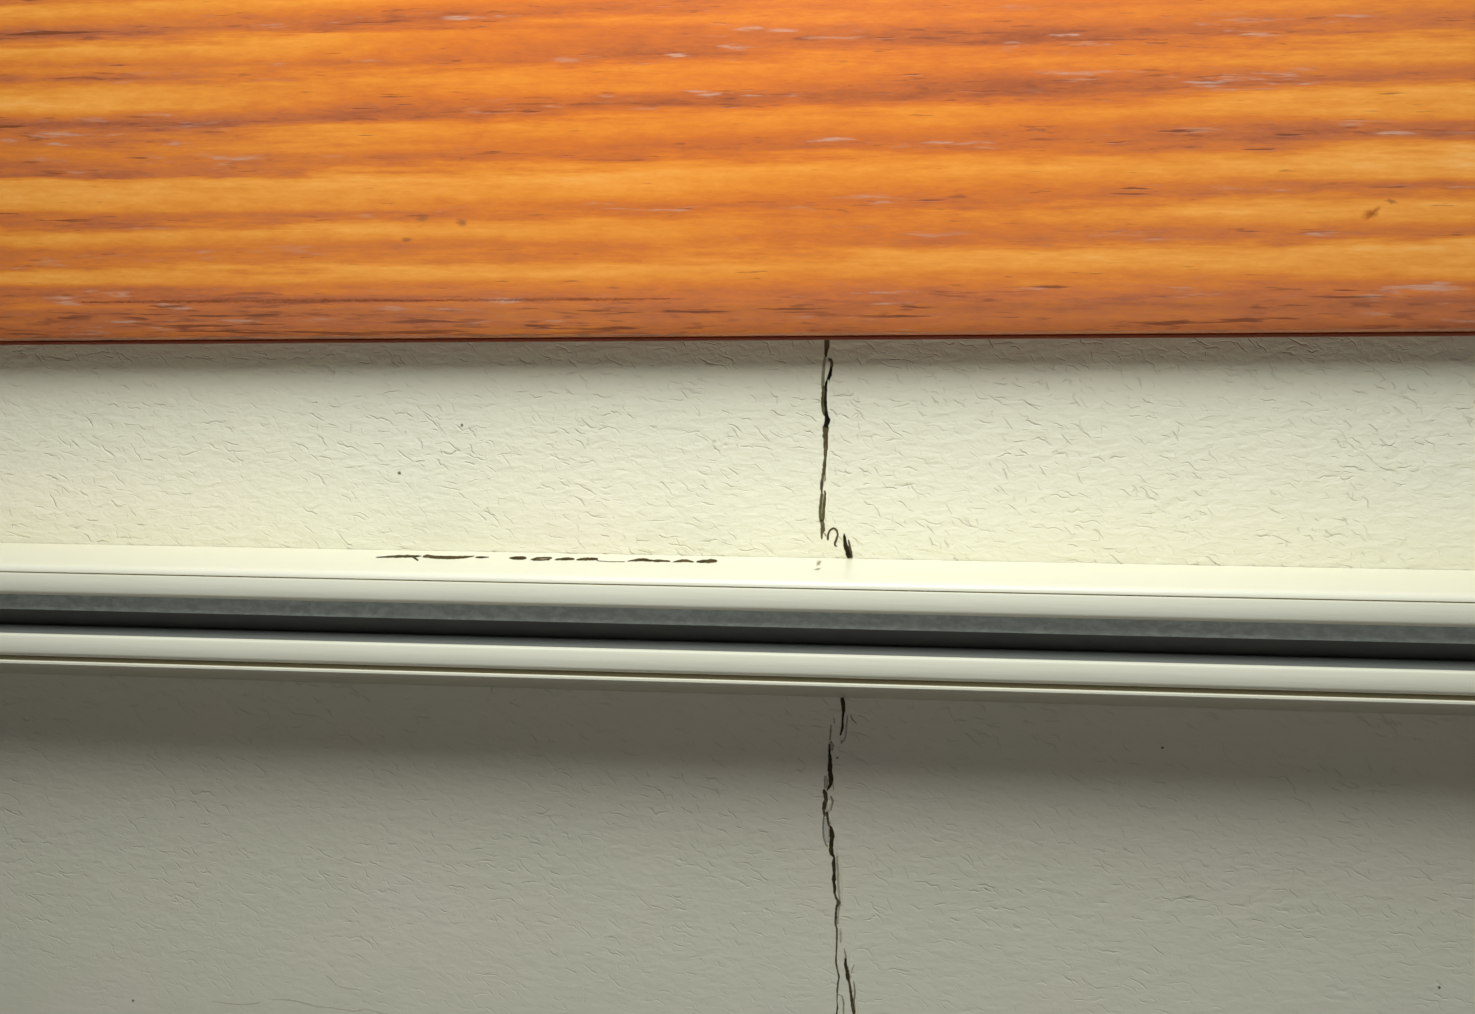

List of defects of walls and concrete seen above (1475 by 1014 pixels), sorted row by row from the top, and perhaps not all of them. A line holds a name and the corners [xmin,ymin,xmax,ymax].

crack [819,340,853,558]
crack [822,697,859,1014]